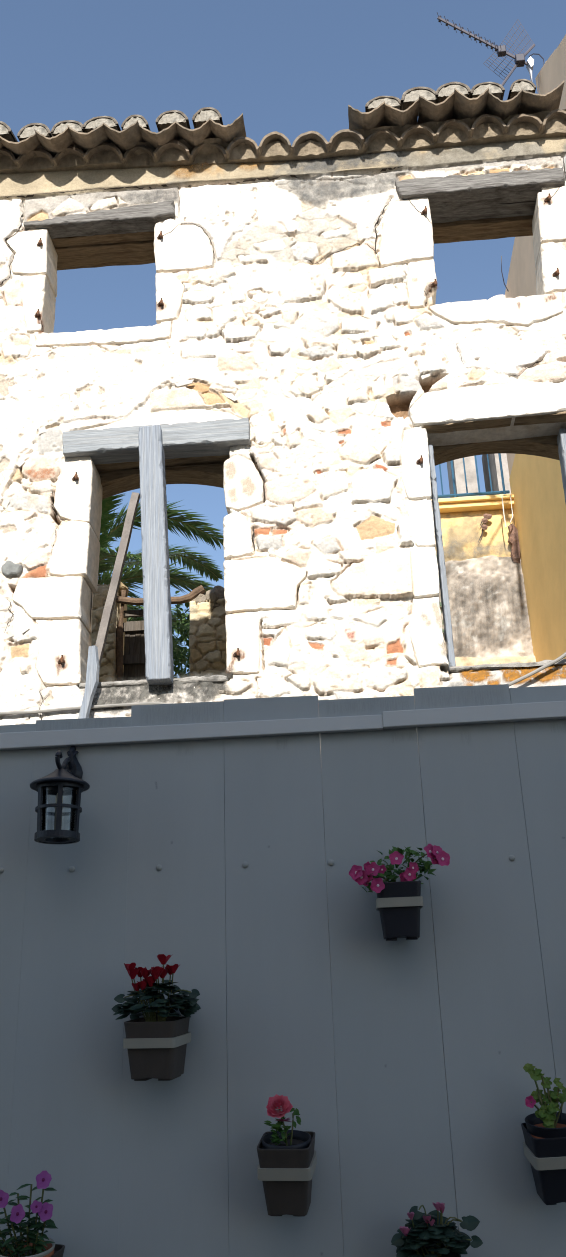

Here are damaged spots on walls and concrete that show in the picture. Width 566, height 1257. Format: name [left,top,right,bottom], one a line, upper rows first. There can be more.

leakage [90,670,231,712]